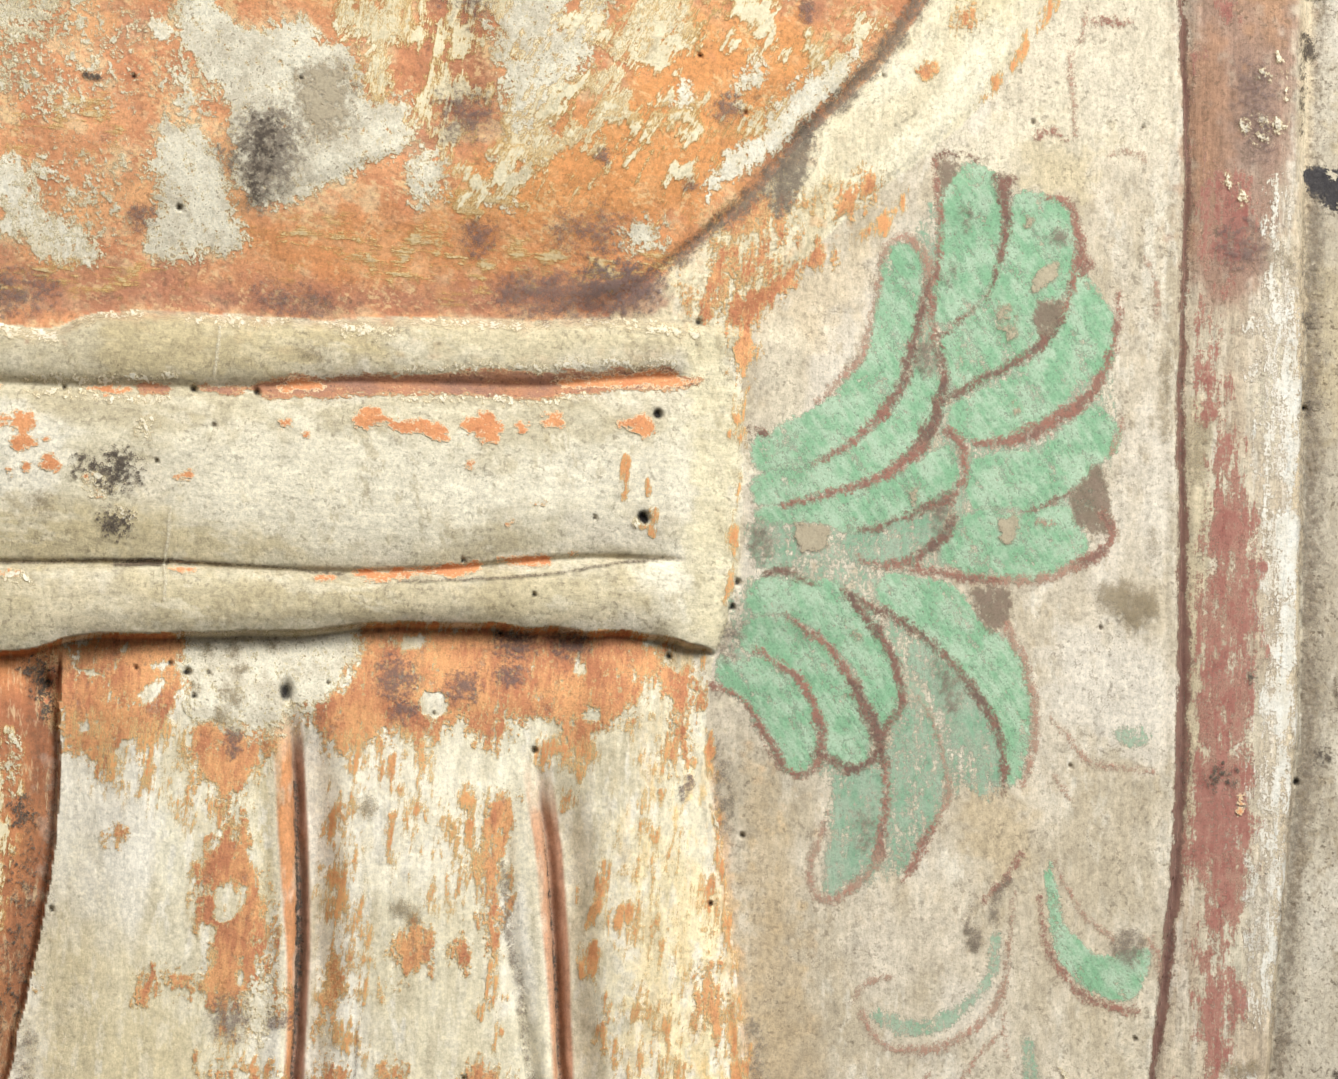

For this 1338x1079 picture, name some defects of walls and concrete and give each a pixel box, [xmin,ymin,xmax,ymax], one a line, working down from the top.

peeling [914,60,940,82]
peeling [948,0,986,37]
peeling [978,0,1061,103]
peeling [1258,50,1290,101]
peeling [1238,113,1290,148]
peeling [0,0,909,447]
peeling [1223,172,1249,207]
peeling [722,473,741,604]
peeling [0,725,25,932]
peeling [33,620,753,1079]